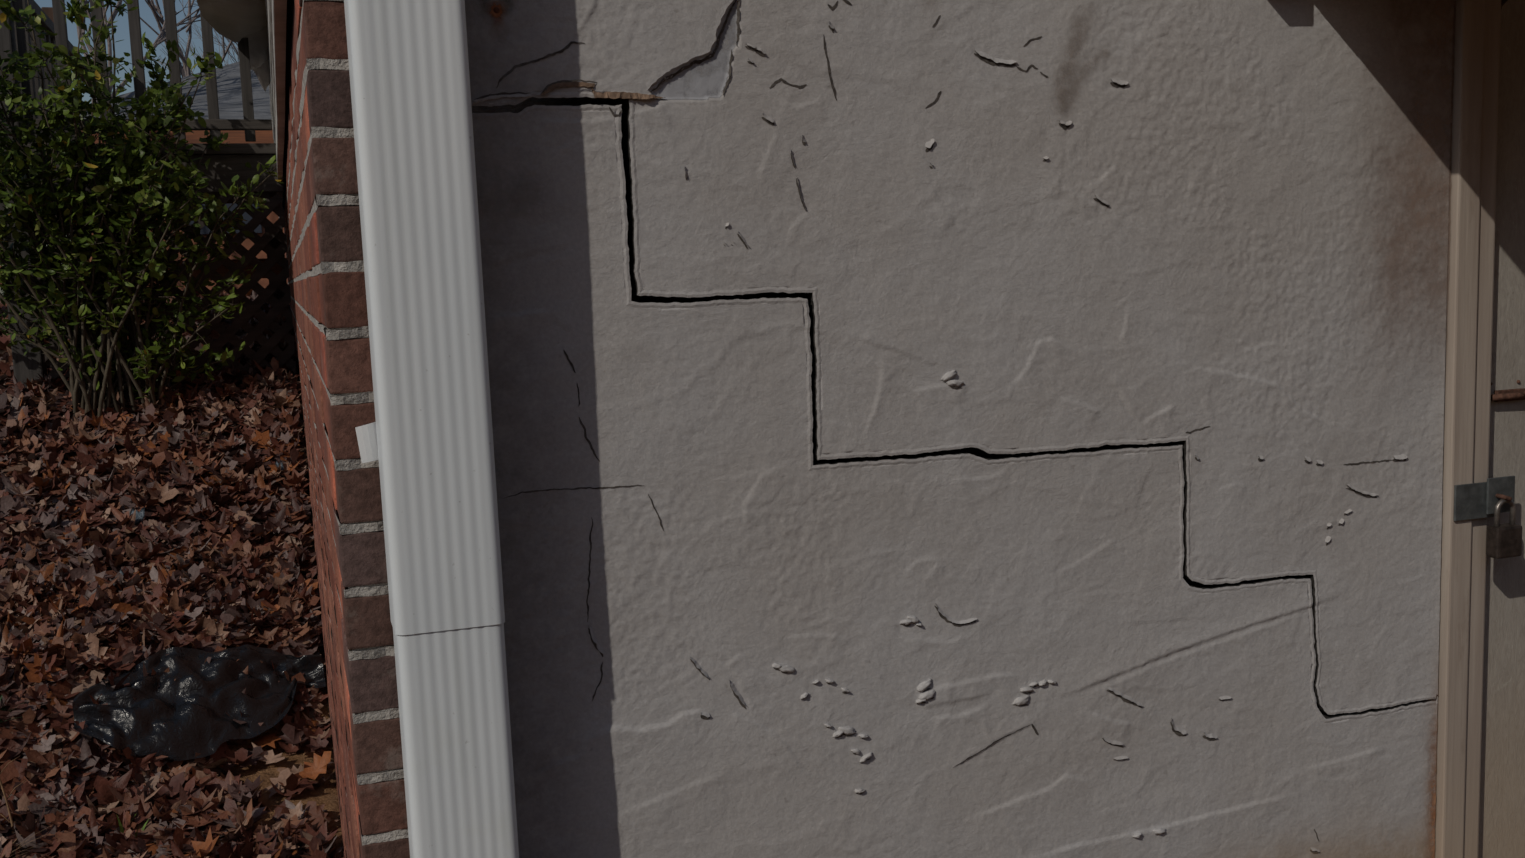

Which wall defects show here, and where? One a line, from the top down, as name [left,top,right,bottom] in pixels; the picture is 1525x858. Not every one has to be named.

flaking render [474,0,766,116]
crack [471,36,1436,723]